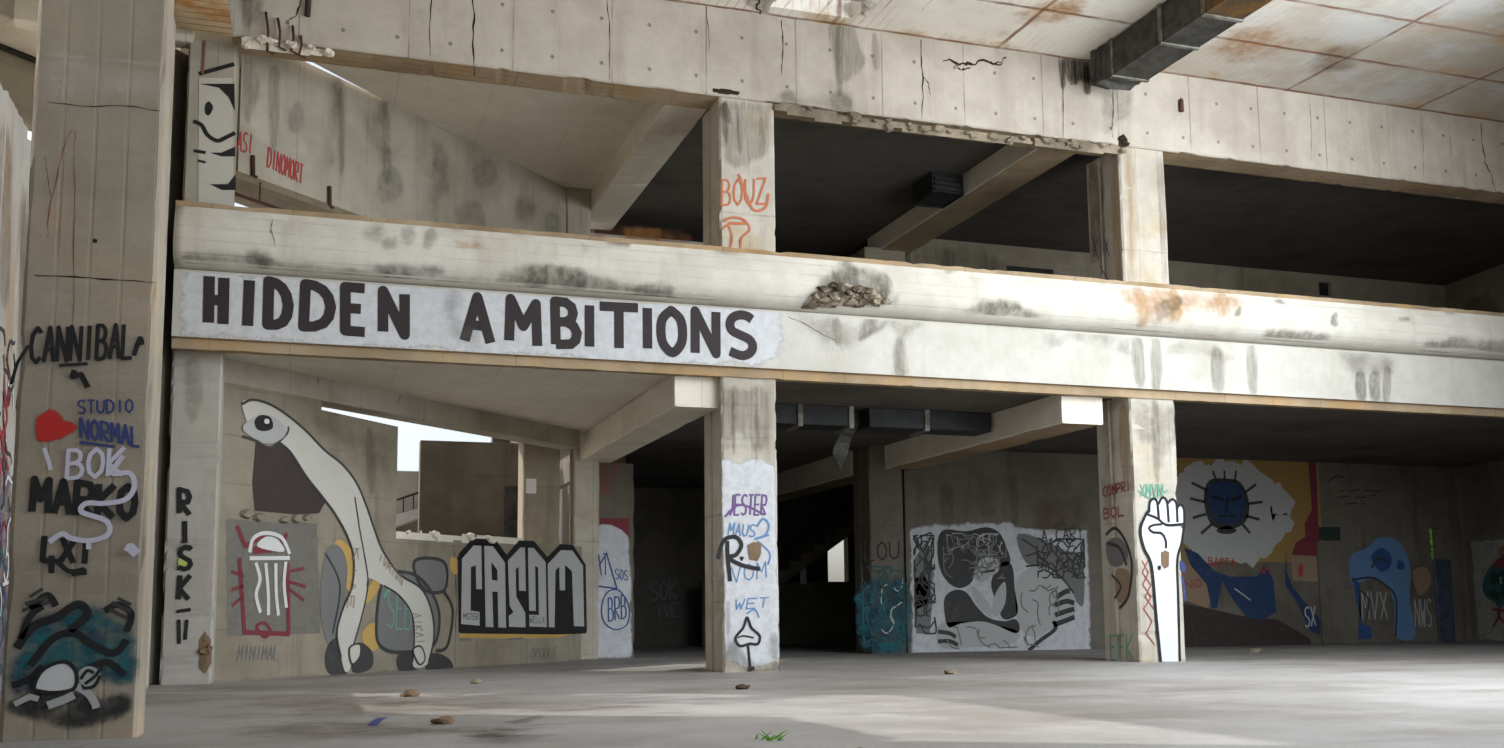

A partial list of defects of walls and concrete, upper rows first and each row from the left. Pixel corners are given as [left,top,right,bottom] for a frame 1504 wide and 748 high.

spalling [241,12,335,59]
crack [469,0,477,76]
crack [604,4,612,79]
crack [755,0,784,75]
spalling [850,0,877,17]
crack [920,40,1007,108]
spalling [801,282,893,310]